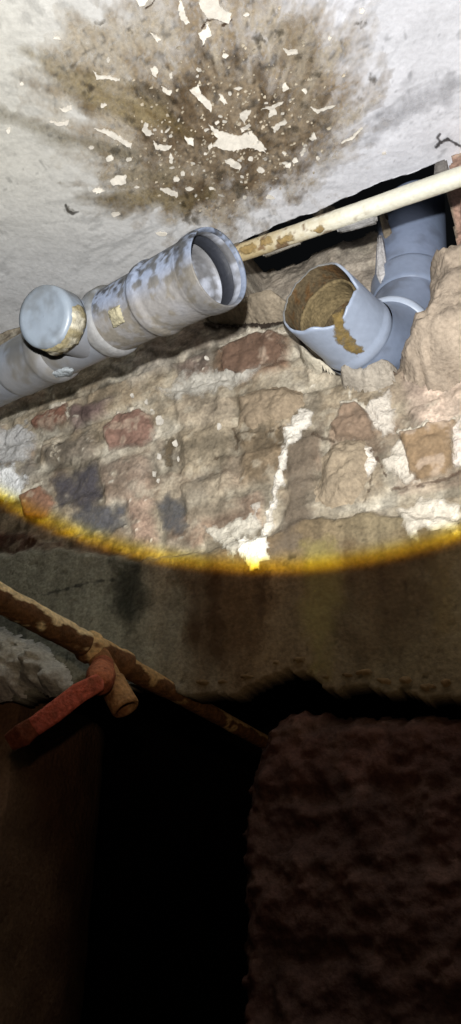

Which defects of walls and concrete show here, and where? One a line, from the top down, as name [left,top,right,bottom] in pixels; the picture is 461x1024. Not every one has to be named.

peeling [178,0,190,25]
peeling [198,0,250,45]
peeling [49,104,72,126]
leakage [34,0,375,228]
peeling [92,40,335,212]
spalling [337,216,386,284]
spalling [204,327,291,373]
spalling [103,393,164,449]
spalling [330,398,373,439]
spalling [152,439,180,483]
spalling [396,417,456,479]
spalling [19,480,54,518]